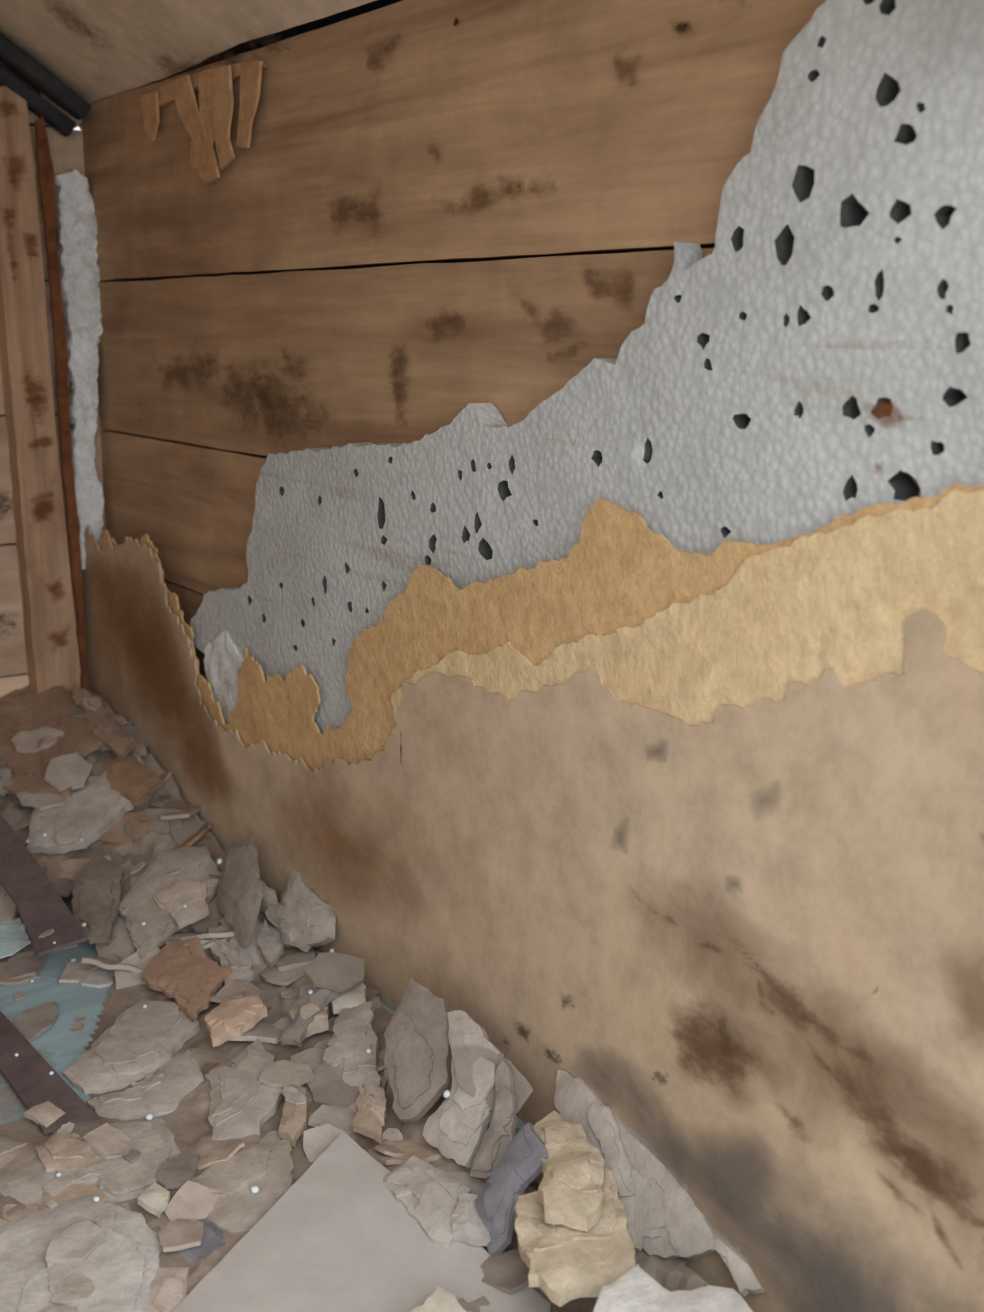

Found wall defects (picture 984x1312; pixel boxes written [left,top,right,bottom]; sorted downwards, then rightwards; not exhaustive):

damp [817,1057,966,1217]
damp [705,1151,889,1312]